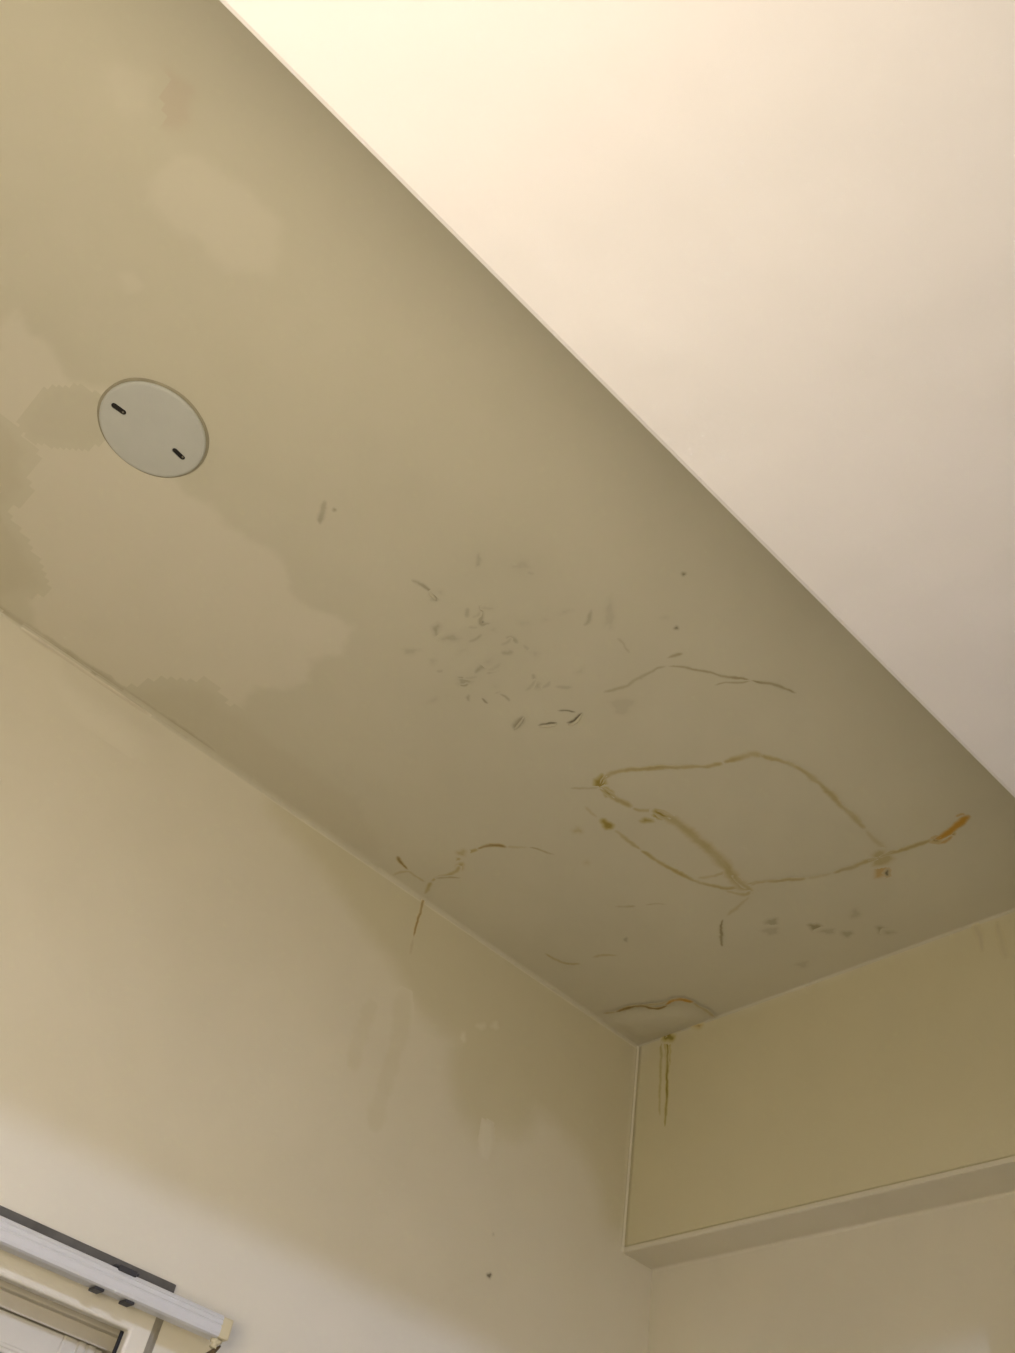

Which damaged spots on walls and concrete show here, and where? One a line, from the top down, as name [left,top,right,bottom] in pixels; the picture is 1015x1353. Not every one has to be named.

water stain [85,45,301,292]
water stain [0,291,1015,1266]
crack [391,749,972,956]
crack [602,637,797,719]
crack [603,997,719,1020]